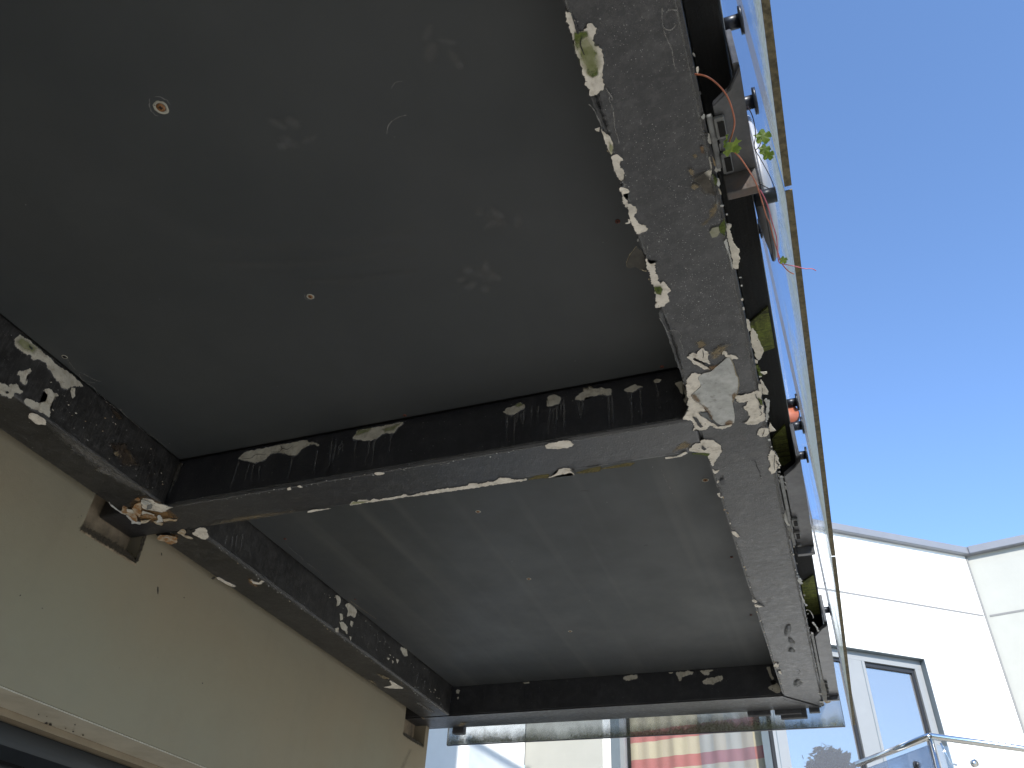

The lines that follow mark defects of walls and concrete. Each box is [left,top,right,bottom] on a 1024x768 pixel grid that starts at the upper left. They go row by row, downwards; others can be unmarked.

peeling [565,10,787,636]
peeling [0,334,89,441]
peeling [503,402,526,416]
peeling [546,394,562,407]
peeling [352,422,404,442]
peeling [545,439,574,449]
peeling [548,467,576,478]
peeling [349,477,528,506]
spalling [109,473,209,561]
peeling [320,593,440,719]
peeling [669,669,723,685]